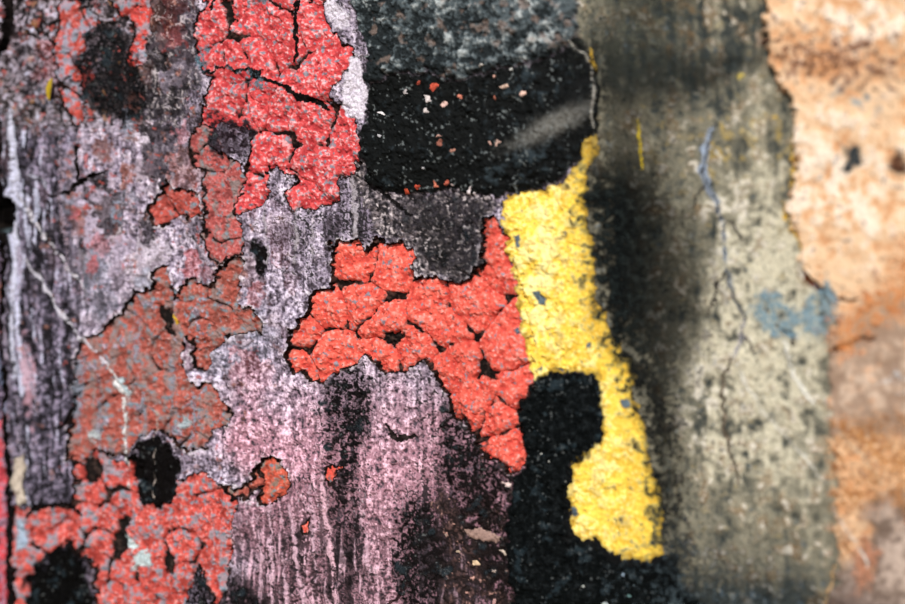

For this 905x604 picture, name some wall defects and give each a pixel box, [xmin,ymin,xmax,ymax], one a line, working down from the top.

crack [0,120,8,202]
crack [0,0,15,56]
crack [0,232,83,604]
peeling [0,0,368,604]
peeling [282,214,542,487]
peeling [417,80,448,113]
crack [692,95,761,486]